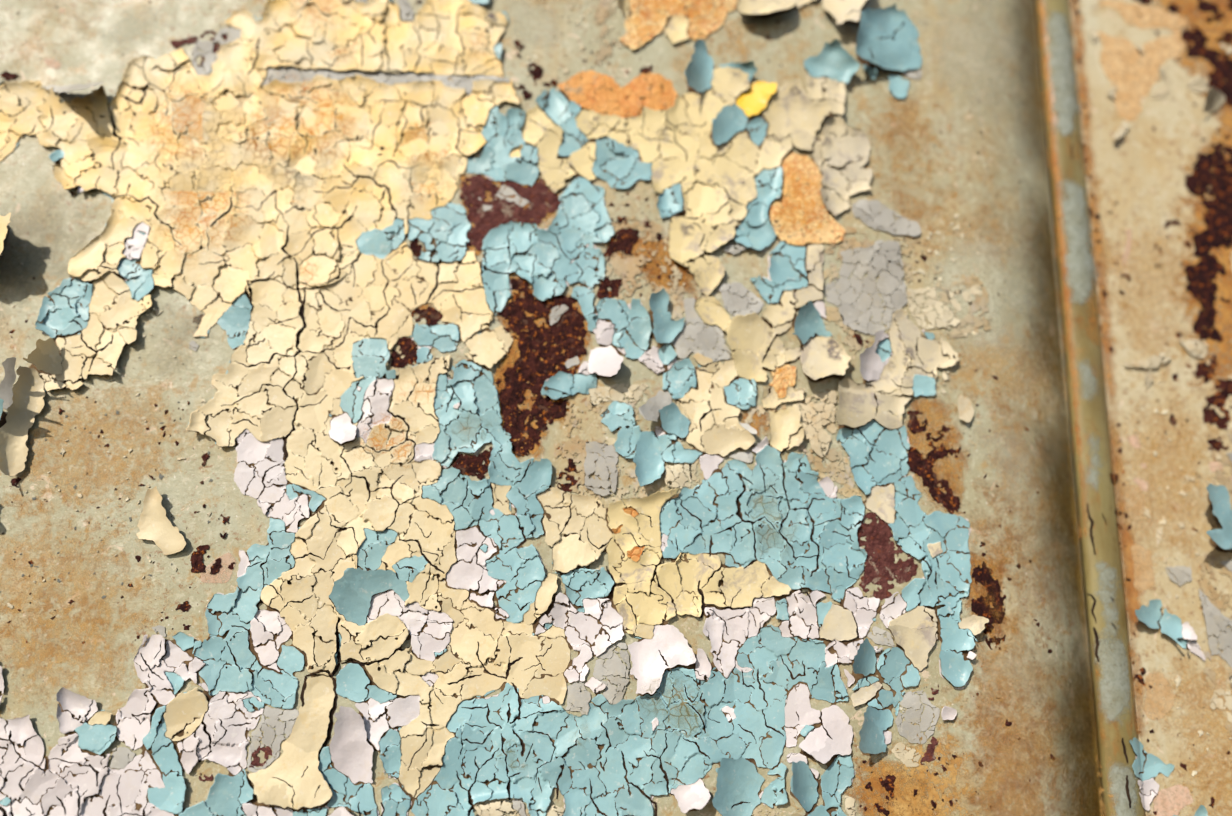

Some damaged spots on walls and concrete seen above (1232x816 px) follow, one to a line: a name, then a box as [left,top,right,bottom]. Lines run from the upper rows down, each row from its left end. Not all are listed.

peeling [822,0,922,99]
peeling [0,212,11,255]
crack [0,0,583,609]
corrosion [459,174,561,256]
corrosion [493,277,591,458]
corrosion [1136,0,1232,490]
peeling [125,484,186,571]
crack [448,452,867,639]
corrosion [857,512,918,602]
crack [286,619,409,809]
crack [408,637,832,816]
peeling [1109,737,1208,816]